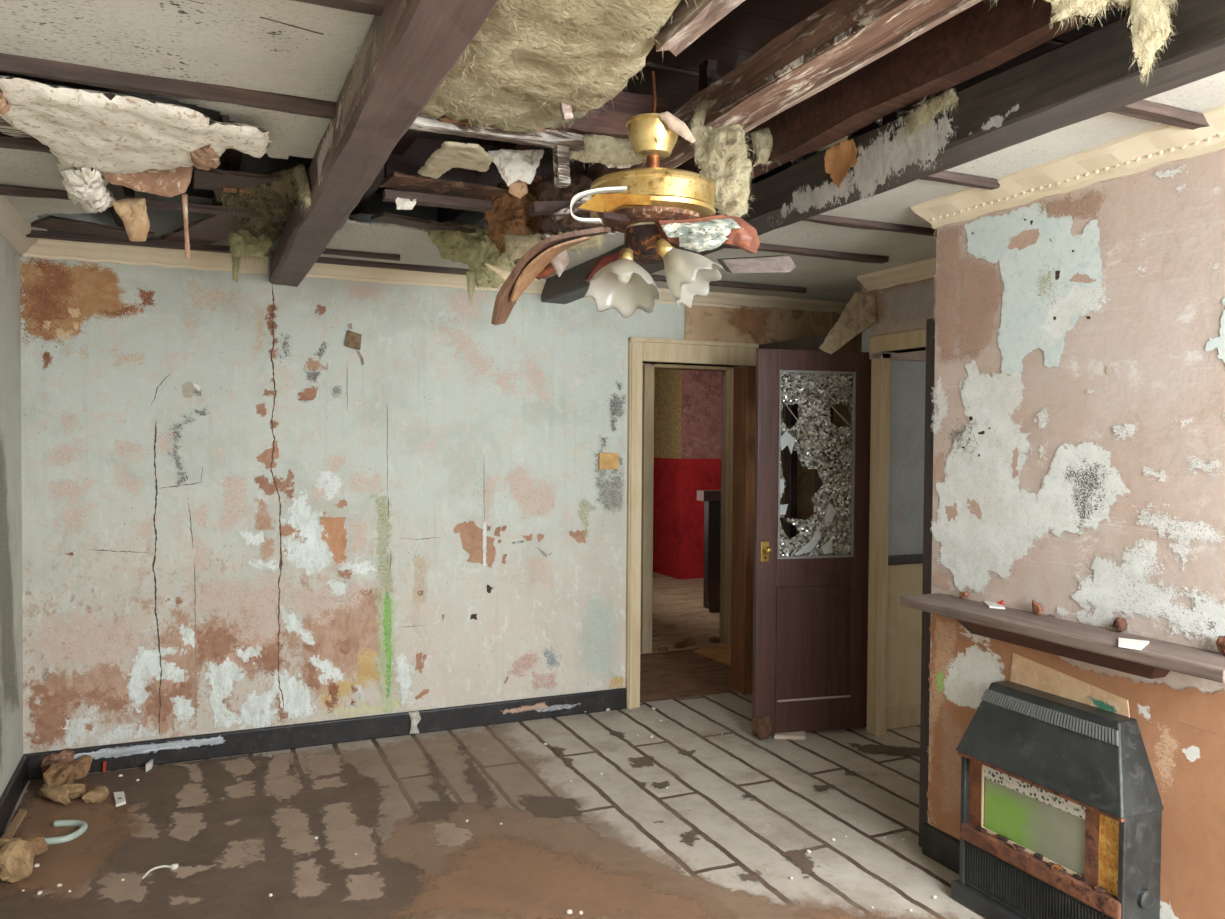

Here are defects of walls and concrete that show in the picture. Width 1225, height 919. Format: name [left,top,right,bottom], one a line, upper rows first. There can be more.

peeling [824,139,857,188]
peeling [1155,163,1190,193]
crack [97,374,203,734]
flaking render [23,403,430,752]
crack [270,288,284,708]
flaking render [454,521,552,568]
peeling [930,202,1139,596]
peeling [1056,503,1225,653]
peeling [1141,465,1170,482]
peeling [1185,456,1225,478]
peeling [1205,298,1225,362]
flaking render [927,613,1225,919]